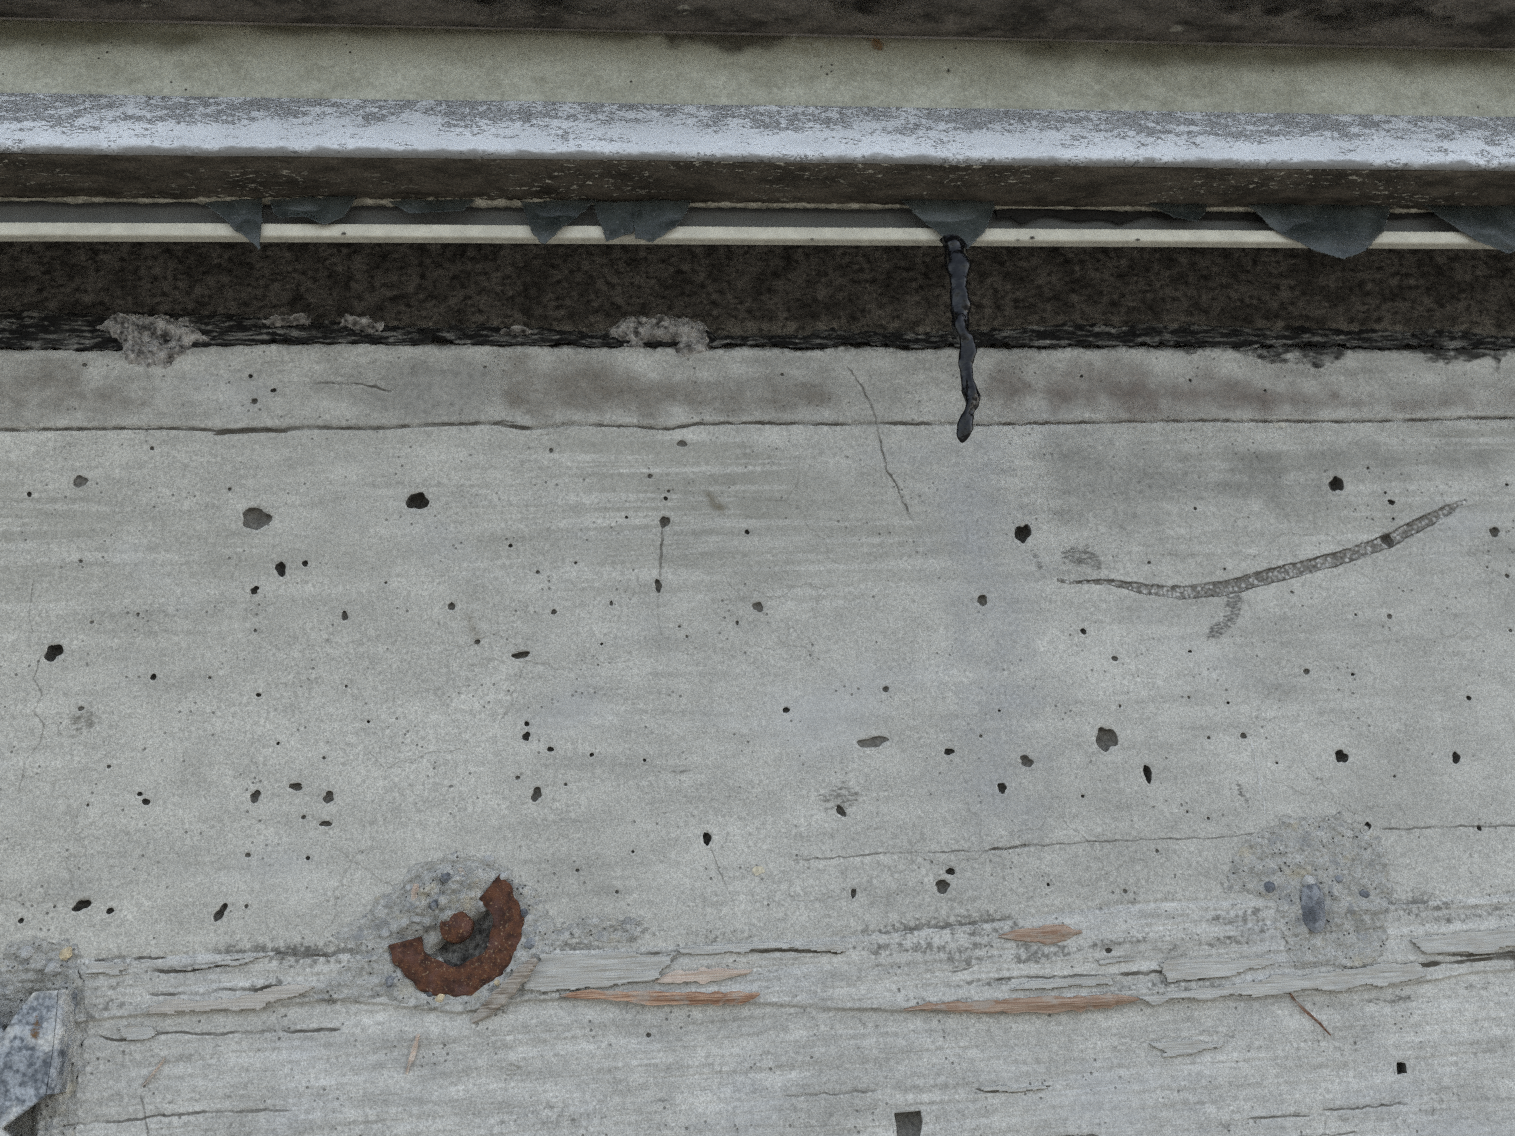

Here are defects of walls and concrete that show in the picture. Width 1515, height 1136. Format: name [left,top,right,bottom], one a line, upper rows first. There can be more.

damp [666,33,782,50]
crack [0,383,532,435]
crack [596,383,931,509]
crack [973,416,1515,426]
spalling [0,936,129,1136]
spalling [117,851,846,1041]
peeling [1010,958,1135,991]
spalling [1138,813,1515,1005]